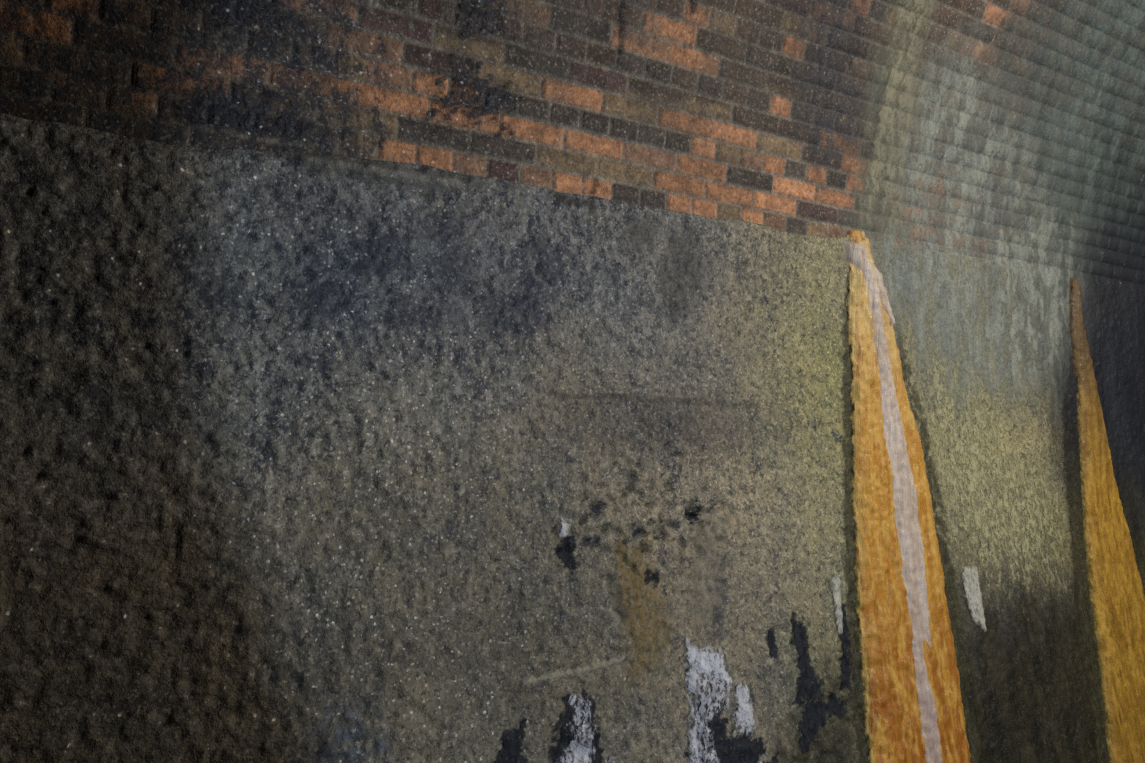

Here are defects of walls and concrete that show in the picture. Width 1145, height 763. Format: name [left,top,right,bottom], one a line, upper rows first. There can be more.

spalling [494,719,530,763]
peeling [549,688,615,763]
peeling [685,637,779,763]
spalling [767,611,849,753]